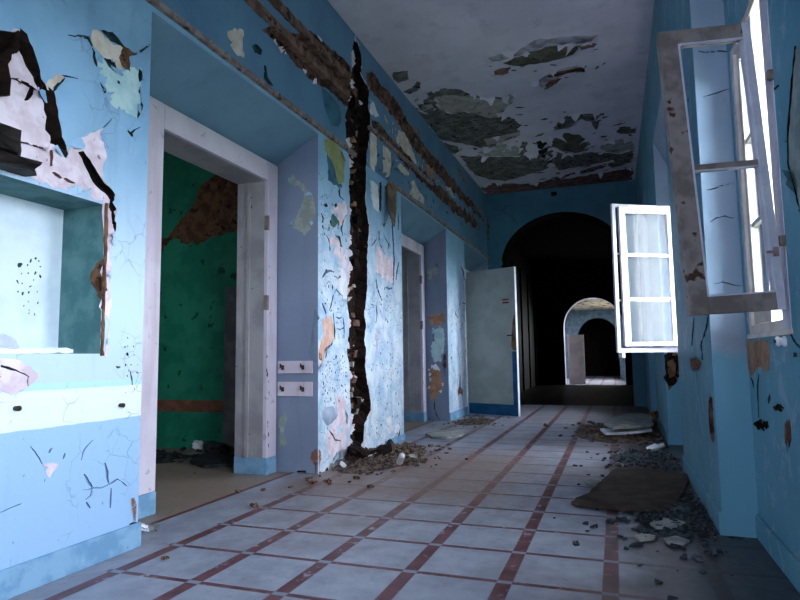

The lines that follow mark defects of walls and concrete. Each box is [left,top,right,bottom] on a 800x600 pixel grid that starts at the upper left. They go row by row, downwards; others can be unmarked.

peeling [91,29,143,119]
peeling [488,34,605,89]
peeling [392,71,638,196]
spalling [0,28,120,357]
peeling [161,174,238,252]
spalling [263,26,490,469]
peeling [0,358,40,399]
spalling [664,352,679,390]
peeling [746,339,784,432]
crack [30,440,127,508]